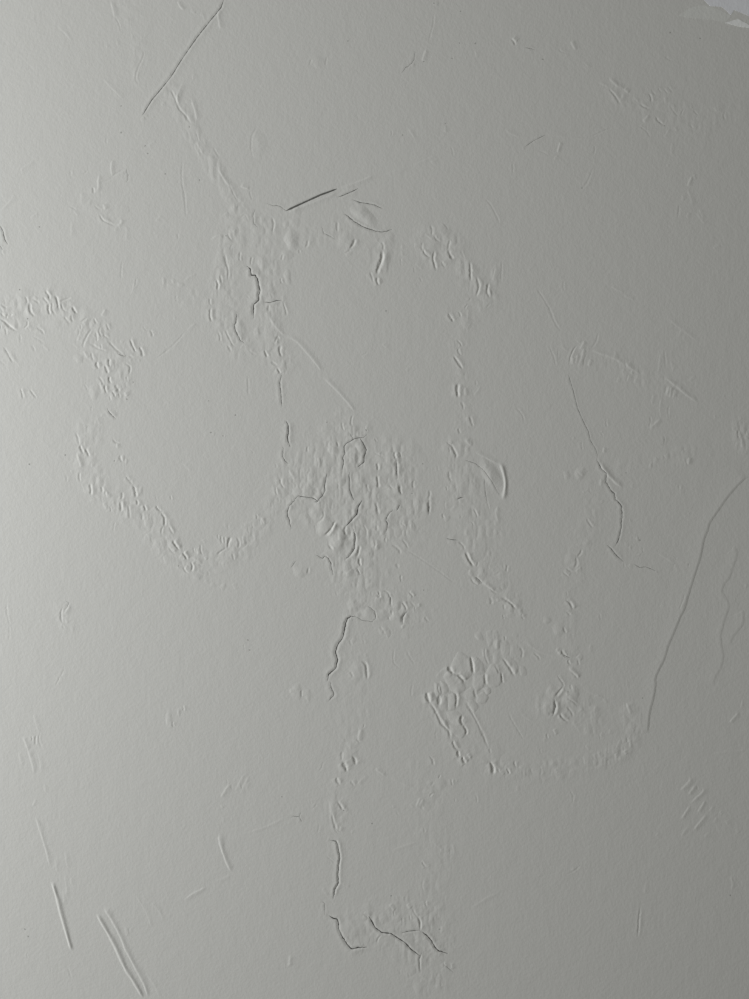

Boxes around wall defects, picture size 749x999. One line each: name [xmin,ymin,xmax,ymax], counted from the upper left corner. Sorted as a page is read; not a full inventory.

crack [139,0,229,117]
crack [228,259,284,346]
crack [592,459,629,565]
crack [322,610,361,705]
crack [321,834,454,977]